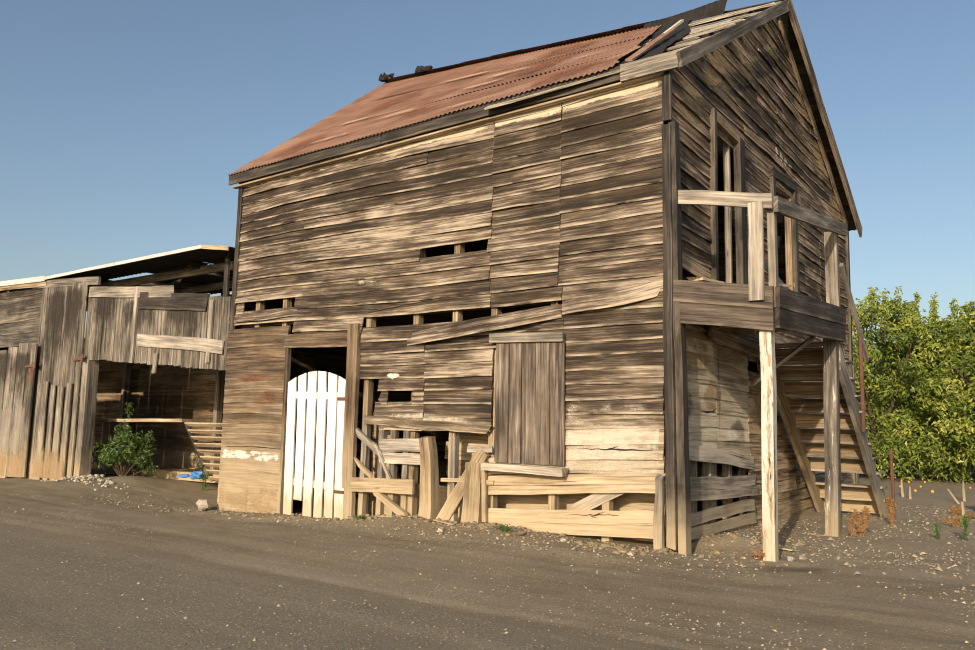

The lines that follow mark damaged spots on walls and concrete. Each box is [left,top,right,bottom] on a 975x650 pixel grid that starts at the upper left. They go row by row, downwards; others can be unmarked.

peeling [222,449,279,462]